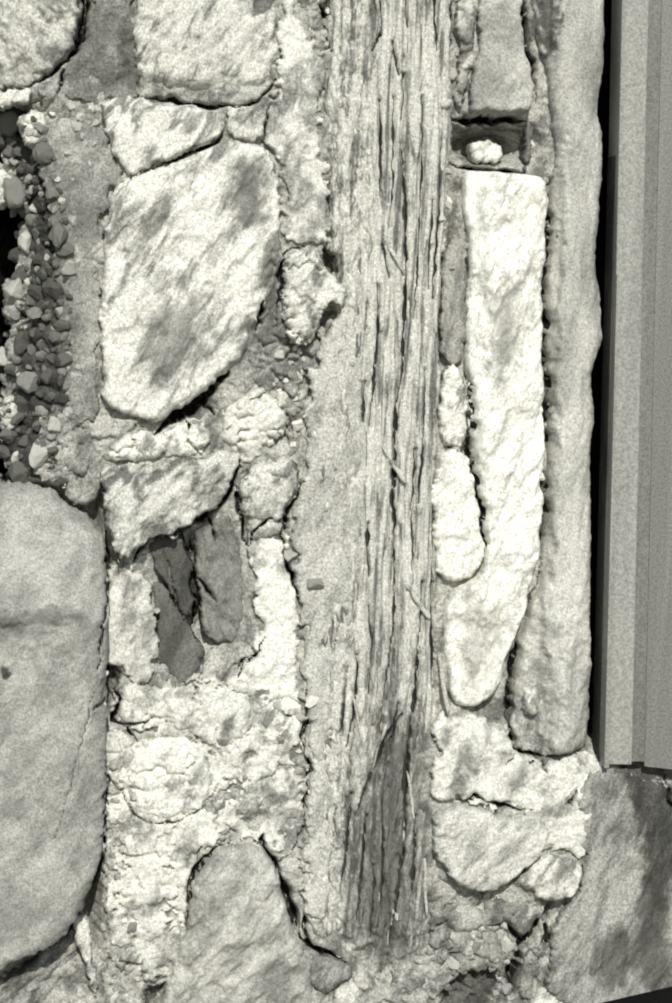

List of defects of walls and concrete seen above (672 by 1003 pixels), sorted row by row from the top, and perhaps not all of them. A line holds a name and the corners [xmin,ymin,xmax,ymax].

crack [154,371,229,435]
crack [168,463,301,682]
crack [53,528,146,839]
crack [259,689,340,959]
crack [460,793,535,810]